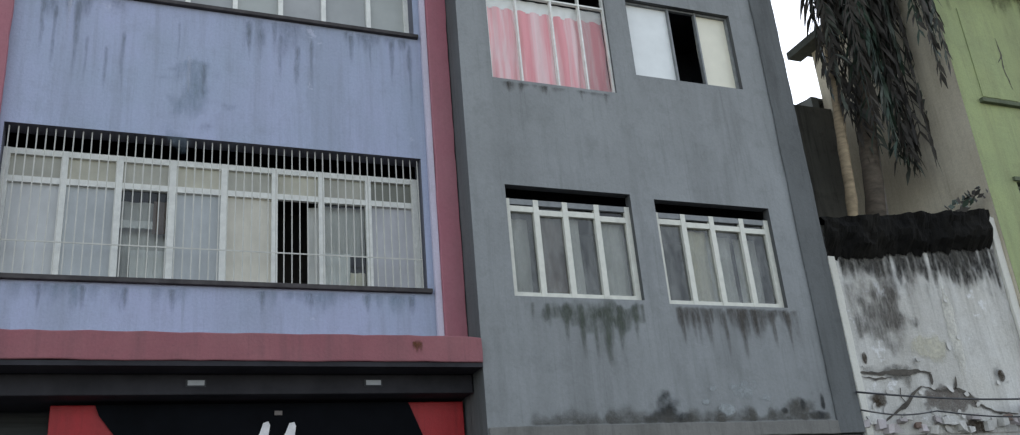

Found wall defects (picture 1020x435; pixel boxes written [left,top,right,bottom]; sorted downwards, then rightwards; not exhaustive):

water stain [579,307,643,353]
water stain [677,307,791,339]
water stain [859,285,903,332]
water stain [647,393,693,423]
water stain [783,396,827,419]
flaking render [872,389,890,413]
flaking render [919,385,997,433]